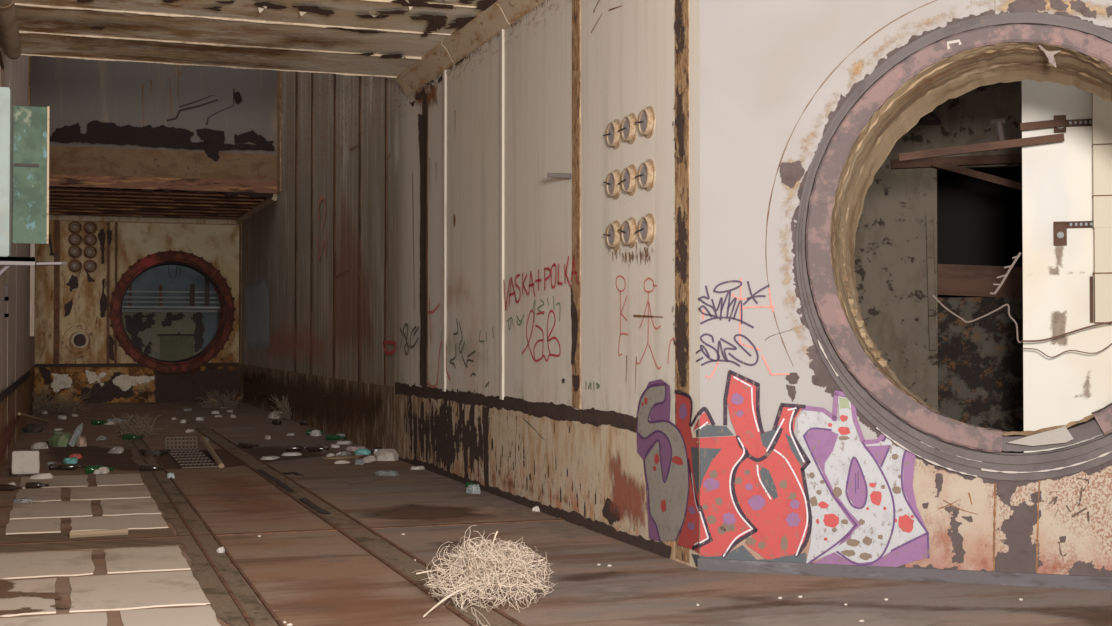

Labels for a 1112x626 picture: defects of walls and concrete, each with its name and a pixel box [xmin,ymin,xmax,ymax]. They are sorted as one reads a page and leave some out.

peeling [254,0,498,37]
peeling [674,0,685,64]
rust [1039,0,1107,16]
rust [852,61,863,79]
peeling [49,120,275,162]
peeling [673,86,685,164]
peeling [779,0,1112,402]
peeling [673,207,688,283]
peeling [0,335,239,403]
rust [602,456,644,525]
peeling [856,408,1112,574]
peeling [1066,560,1112,577]